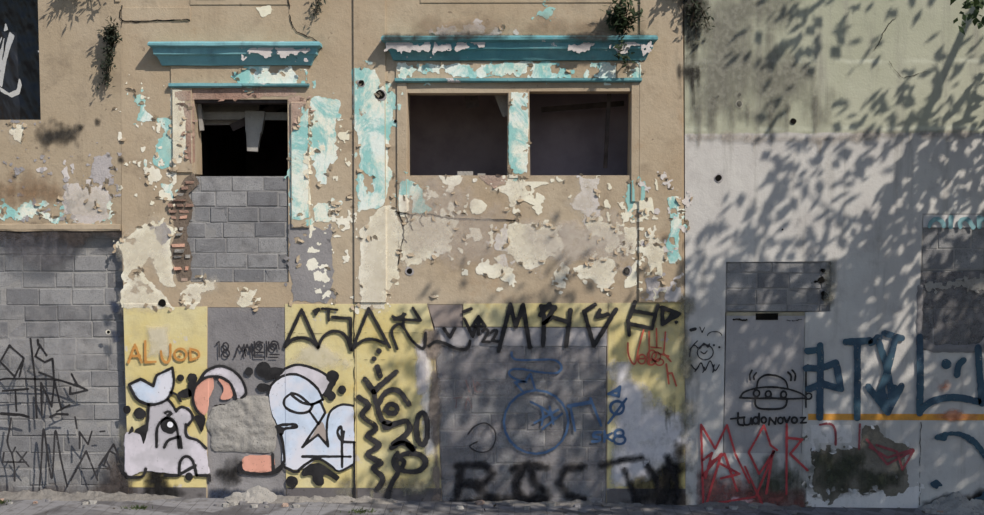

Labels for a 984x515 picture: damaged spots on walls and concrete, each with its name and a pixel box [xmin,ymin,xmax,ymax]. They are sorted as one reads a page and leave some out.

crack [288,0,322,49]
damp [678,0,815,123]
damp [39,125,83,145]
peeling [0,19,693,314]
spalling [801,420,925,508]